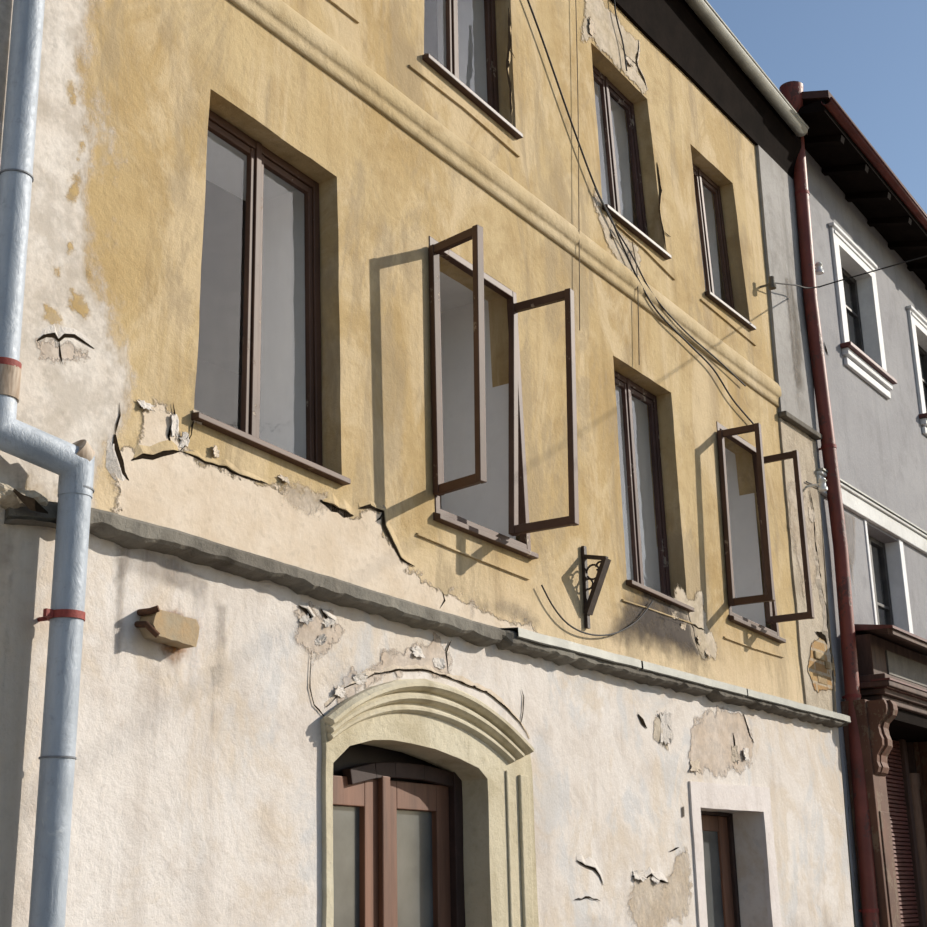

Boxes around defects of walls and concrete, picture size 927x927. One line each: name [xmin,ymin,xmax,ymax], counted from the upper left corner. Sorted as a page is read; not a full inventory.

peeling [0,0,13,165]
flaking render [581,0,647,95]
crack [36,323,94,364]
peeling [16,0,537,633]
peeling [0,450,59,514]
flaking render [295,601,345,659]
flaking render [671,586,718,660]
flaking render [808,638,836,693]
flaking render [689,705,753,778]
crack [575,854,605,901]
crack [631,867,668,883]
flaking render [629,849,692,927]